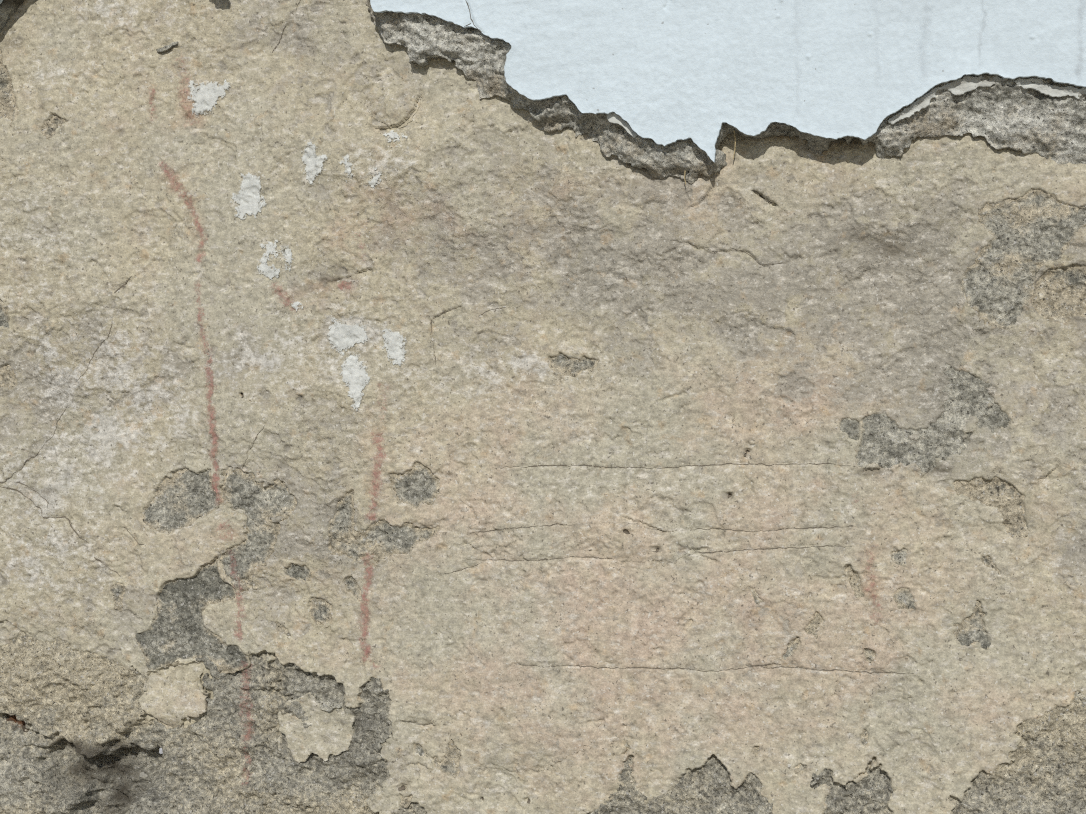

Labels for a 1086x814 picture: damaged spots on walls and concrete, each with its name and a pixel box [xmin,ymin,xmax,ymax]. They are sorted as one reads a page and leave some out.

spalling [365,0,1086,184]
spalling [960,189,1086,332]
peeling [340,354,370,411]
spalling [840,363,1011,473]
spalling [328,490,440,564]
spalling [389,462,440,509]
spalling [953,477,1029,539]
spalling [0,466,392,814]
spalling [953,600,991,650]
spalling [589,742,773,814]
spalling [794,729,894,814]
spalling [949,687,1086,814]